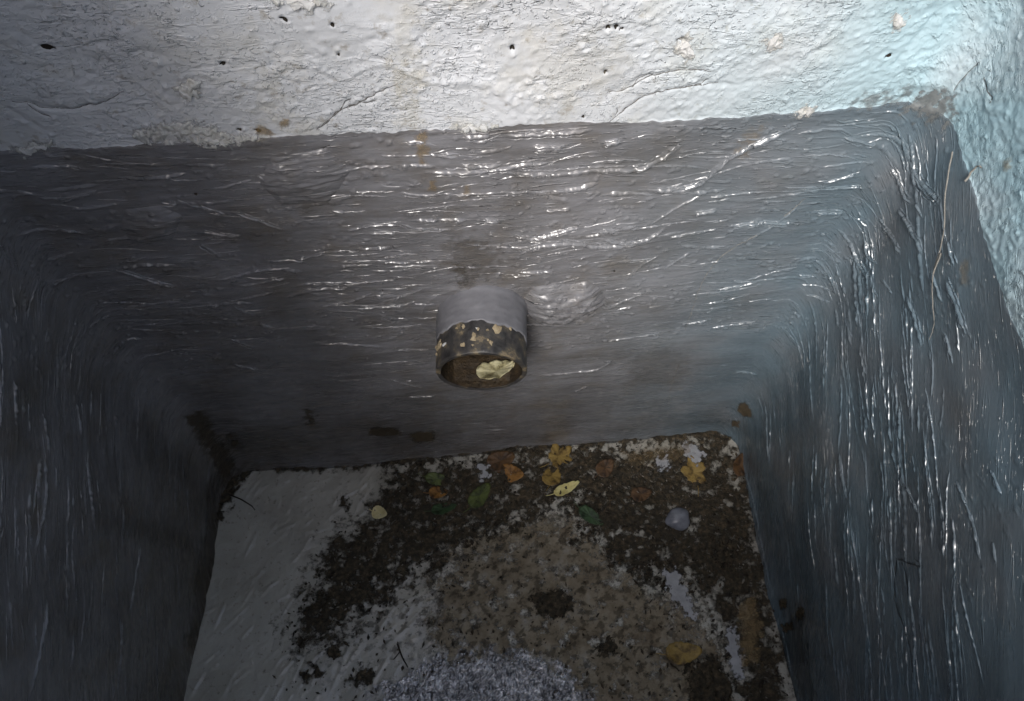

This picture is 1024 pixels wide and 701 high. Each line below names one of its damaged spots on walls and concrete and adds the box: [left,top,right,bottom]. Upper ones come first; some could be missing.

crack [12,91,122,116]
crack [607,69,717,122]